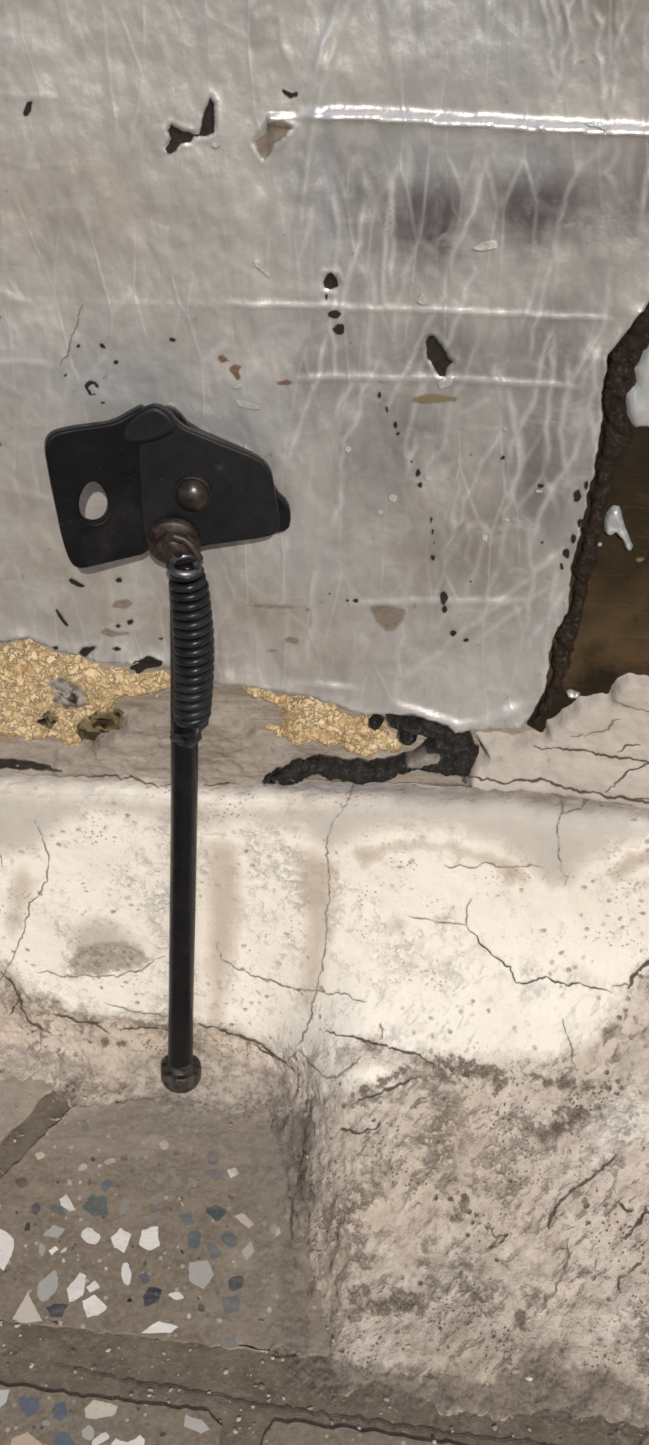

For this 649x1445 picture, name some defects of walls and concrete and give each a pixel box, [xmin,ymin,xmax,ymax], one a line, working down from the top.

peeling [165,98,221,153]
peeling [560,519,585,570]
peeling [598,505,643,562]
spalling [0,638,170,747]
spalling [243,686,438,758]
crack [410,699,649,1065]
crack [0,784,433,1293]
crack [446,1226,509,1294]
crack [539,1154,649,1308]